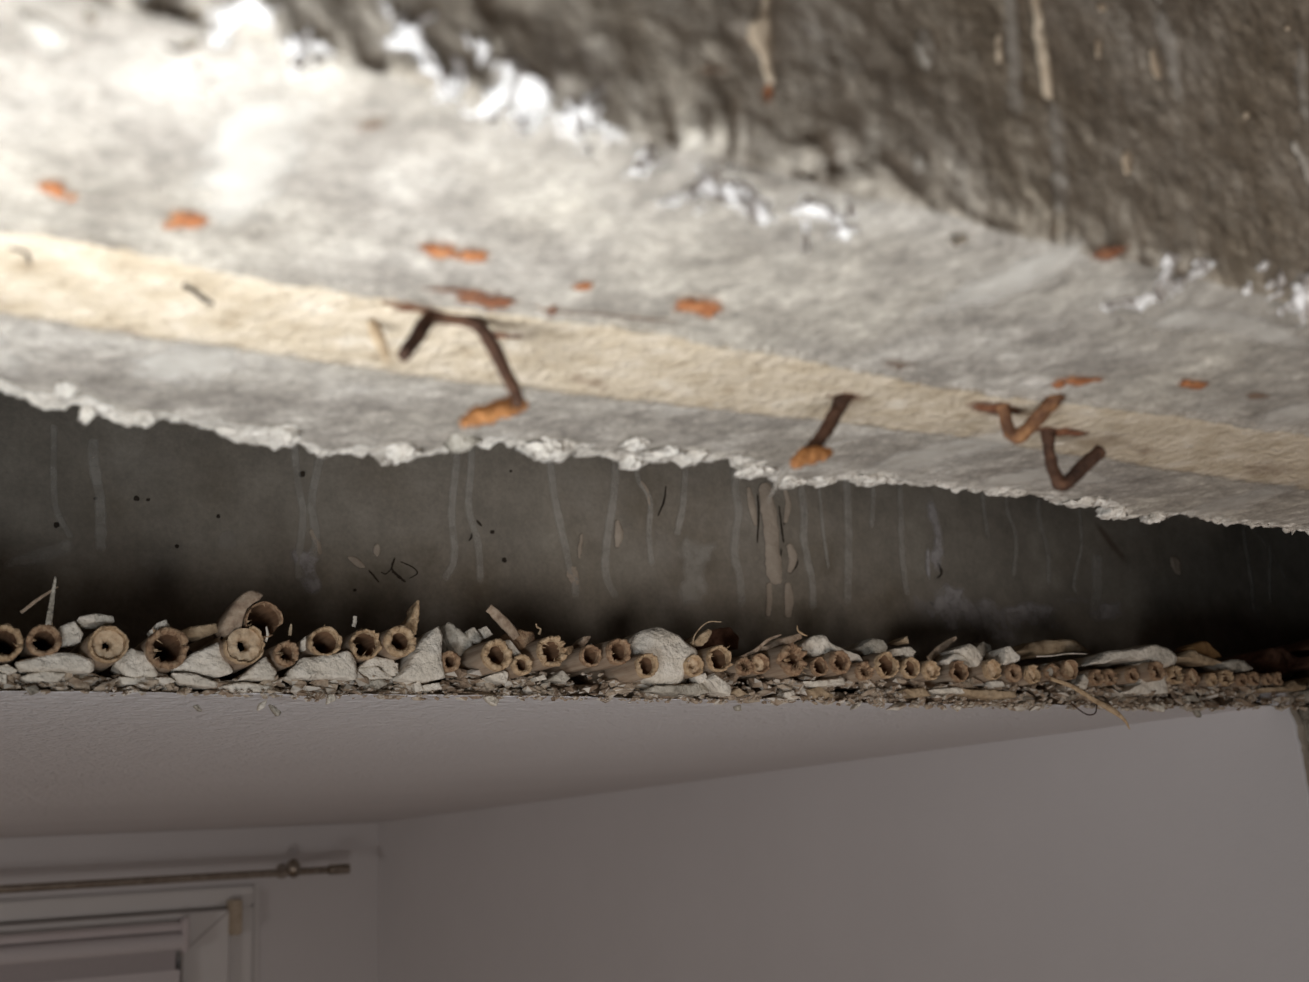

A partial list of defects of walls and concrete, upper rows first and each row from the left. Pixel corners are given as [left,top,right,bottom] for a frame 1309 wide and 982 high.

water stain [379,2,628,154]
water stain [656,165,860,257]
corrosion [419,244,487,262]
corrosion [426,288,514,310]
corrosion [674,299,722,318]
water stain [1100,252,1309,342]
corrosion [459,396,529,428]
corrosion [972,402,1023,414]
water stain [879,432,1012,471]
water stain [980,470,1101,488]
peeling [746,482,797,618]
peeling [483,695,499,706]